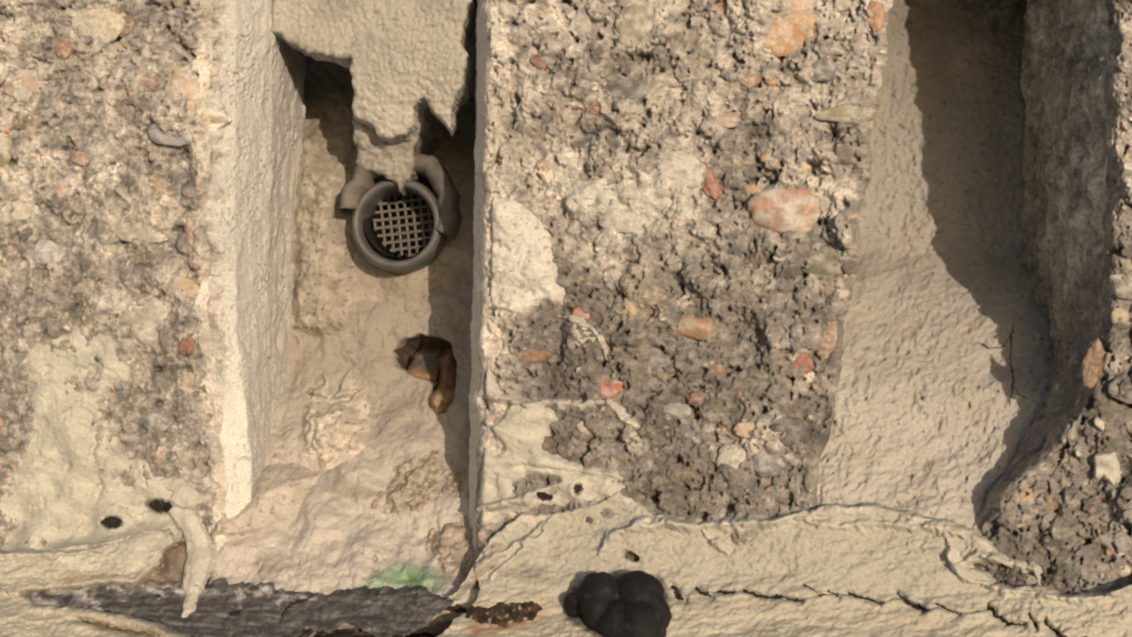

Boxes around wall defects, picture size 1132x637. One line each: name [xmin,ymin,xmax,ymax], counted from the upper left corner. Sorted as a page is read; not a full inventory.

hole [313,628,375,637]
corrosion [465,601,543,633]
crack [671,584,1087,637]